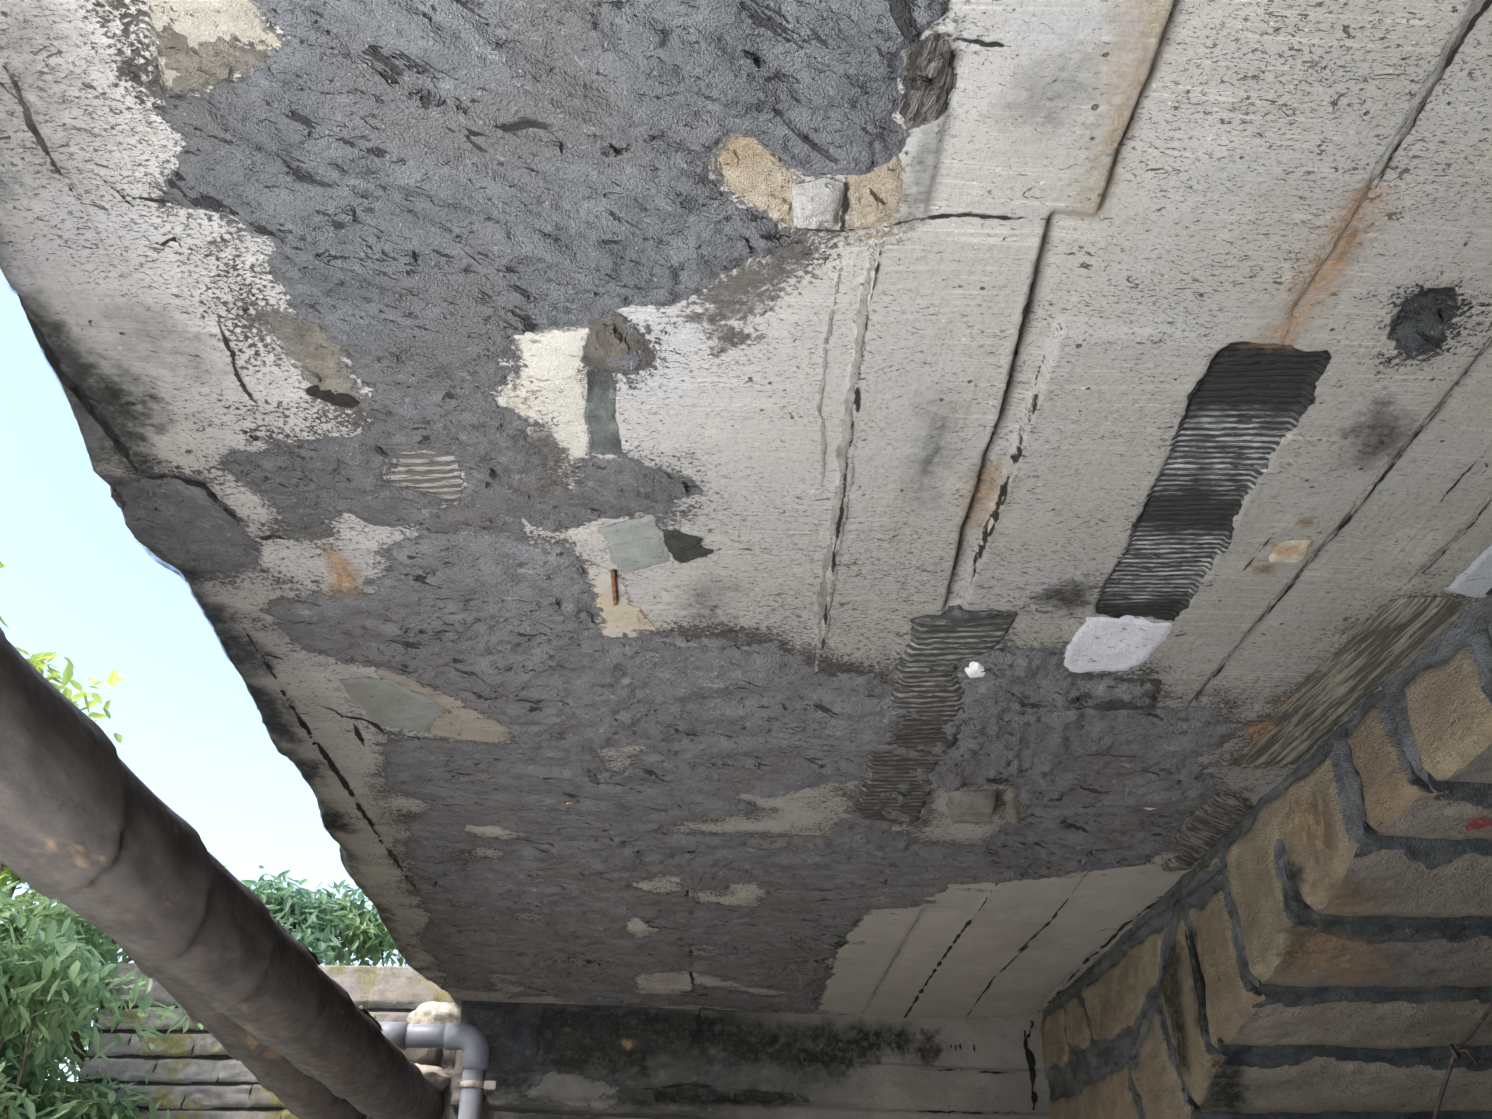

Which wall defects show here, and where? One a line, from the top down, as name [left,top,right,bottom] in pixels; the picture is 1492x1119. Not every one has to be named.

crack [1116,1,1175,153]
crack [1375,0,1492,188]
spalling [172,244,214,277]
spalling [216,387,274,421]
crack [764,70,1046,657]
crack [1330,345,1489,541]
spalling [1348,258,1492,386]
peeling [1268,540,1312,563]
crack [238,624,430,912]
damp [917,1030,942,1063]
crack [904,883,998,1018]
crack [919,871,1163,1114]